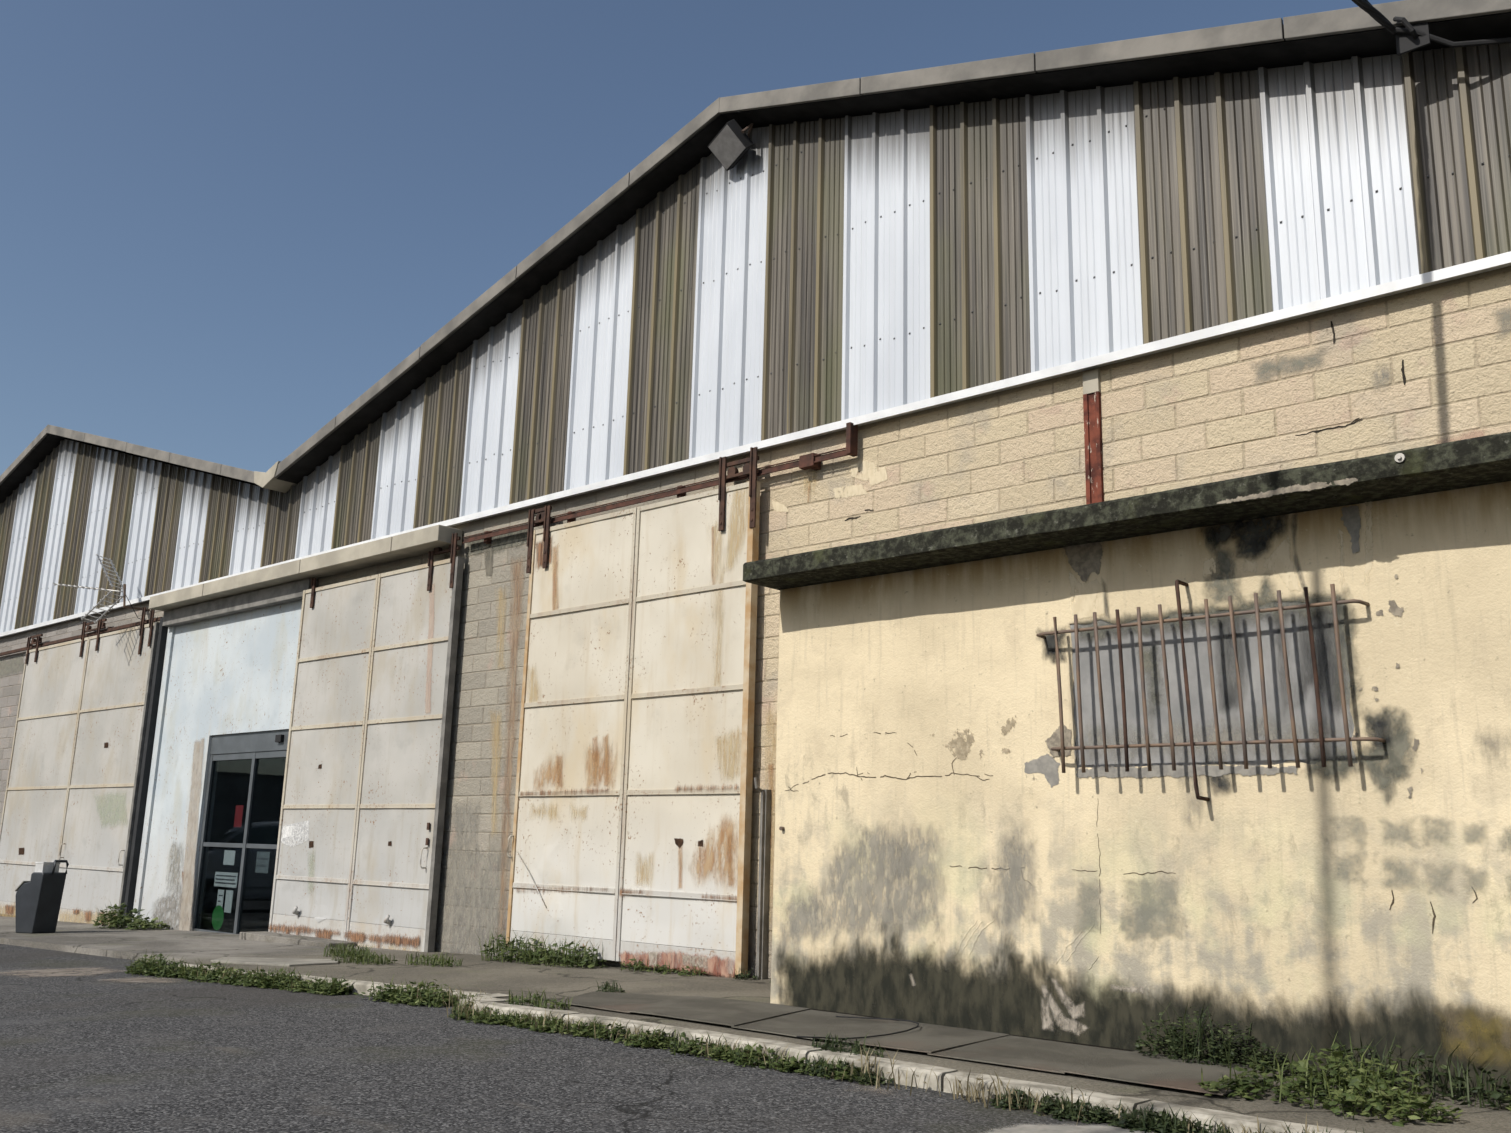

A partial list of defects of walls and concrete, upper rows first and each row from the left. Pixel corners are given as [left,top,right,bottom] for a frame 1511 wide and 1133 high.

water stain [1042,502,1373,708]
rust [493,538,612,931]
crack [785,732,993,792]
water stain [1212,776,1230,791]
water stain [1164,728,1293,753]
water stain [1309,710,1423,801]
rust [679,823,737,900]
rust [619,951,735,978]